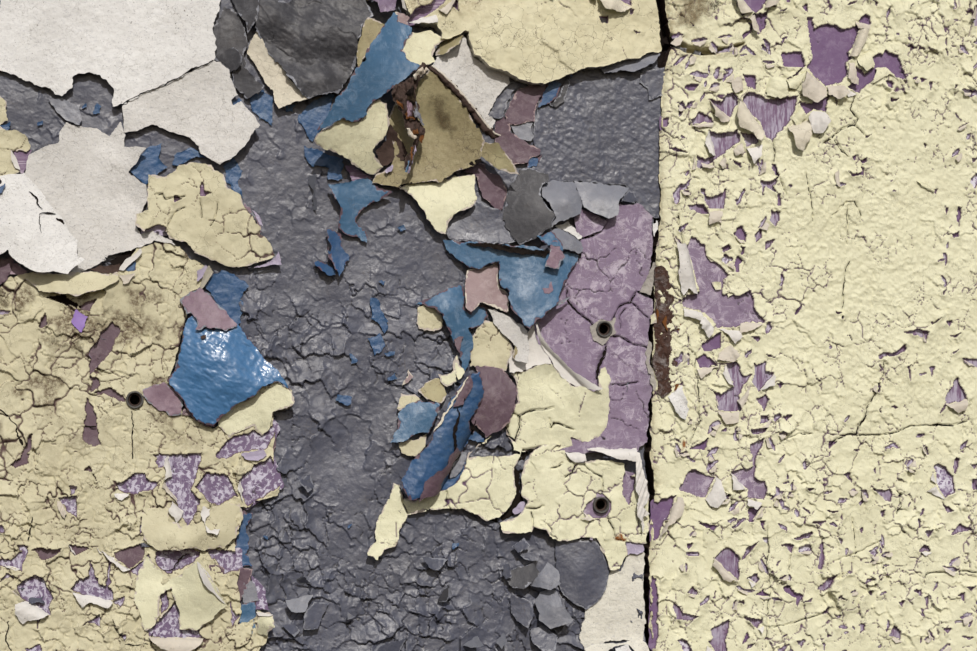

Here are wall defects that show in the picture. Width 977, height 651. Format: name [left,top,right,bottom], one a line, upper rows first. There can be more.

crack [656,0,704,68]
peeling [678,0,905,249]
peeling [0,0,738,651]
crack [506,408,572,451]
crack [566,289,649,387]
corrosion [649,265,681,398]
peeling [674,227,782,529]
crack [801,362,968,445]
peeling [927,458,958,512]
crack [608,520,648,645]
peeling [712,545,771,647]
peeling [781,510,834,590]